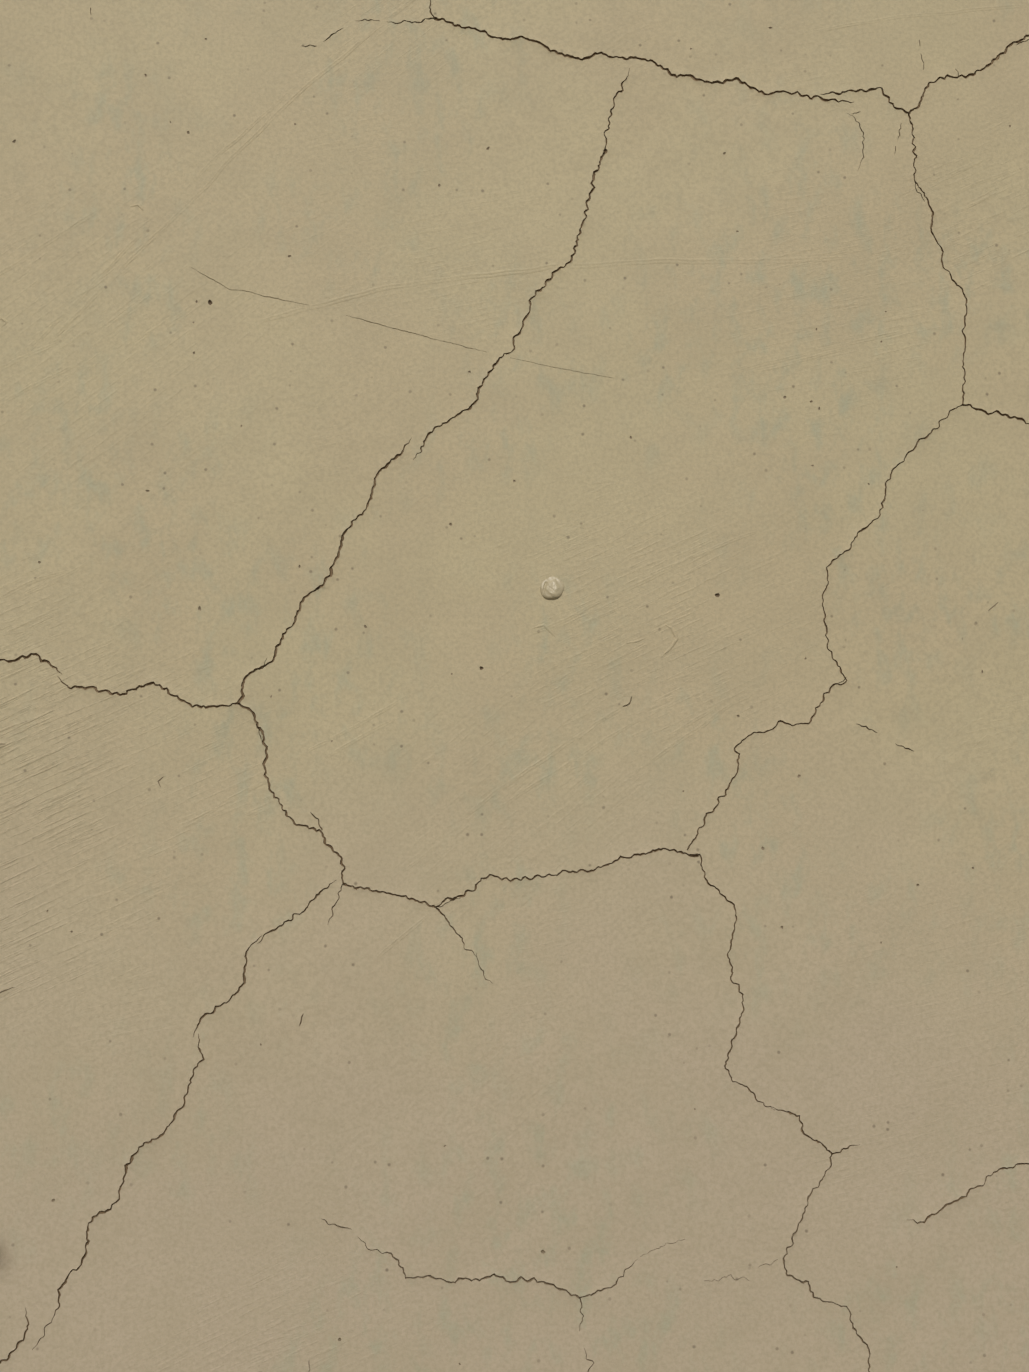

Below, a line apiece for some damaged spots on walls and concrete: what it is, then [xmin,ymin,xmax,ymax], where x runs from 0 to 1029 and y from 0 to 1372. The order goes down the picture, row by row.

crack [191,267,307,305]
crack [347,315,485,352]
crack [392,0,1029,850]
crack [0,653,62,674]
crack [32,437,871,1372]
crack [912,1163,1029,1224]
crack [0,1308,29,1364]